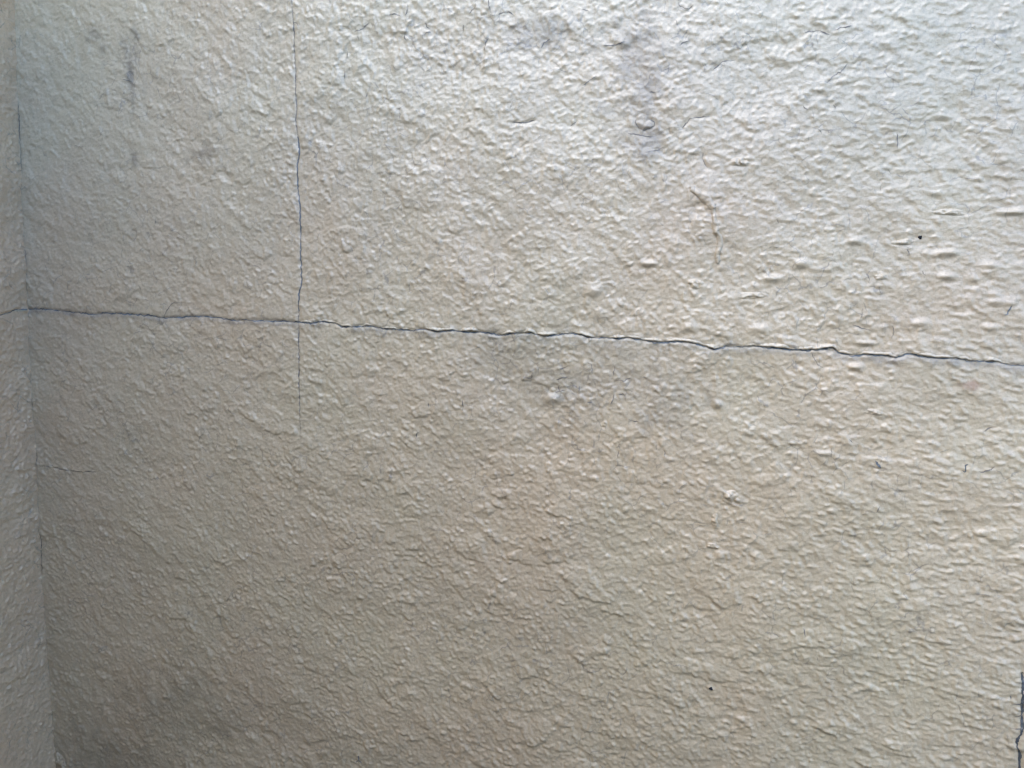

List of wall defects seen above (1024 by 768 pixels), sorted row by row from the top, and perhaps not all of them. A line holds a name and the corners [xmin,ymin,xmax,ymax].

crack [0,0,1024,437]